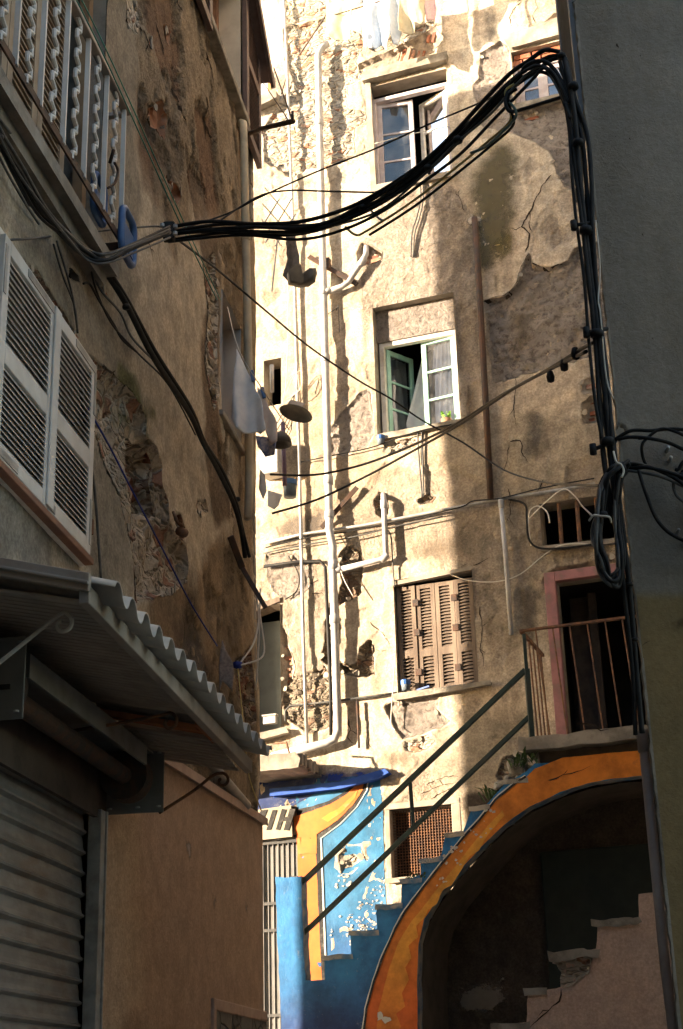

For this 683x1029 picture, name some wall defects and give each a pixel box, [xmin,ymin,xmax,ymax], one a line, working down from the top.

flaking render [472,41,571,189]
leakage [468,145,519,286]
crack [484,174,562,304]
flaking render [484,243,607,383]
spalling [125,444,153,518]
flaking render [384,696,449,740]
flaking render [335,849,368,888]
peeling [339,879,385,945]
crack [531,991,562,1026]